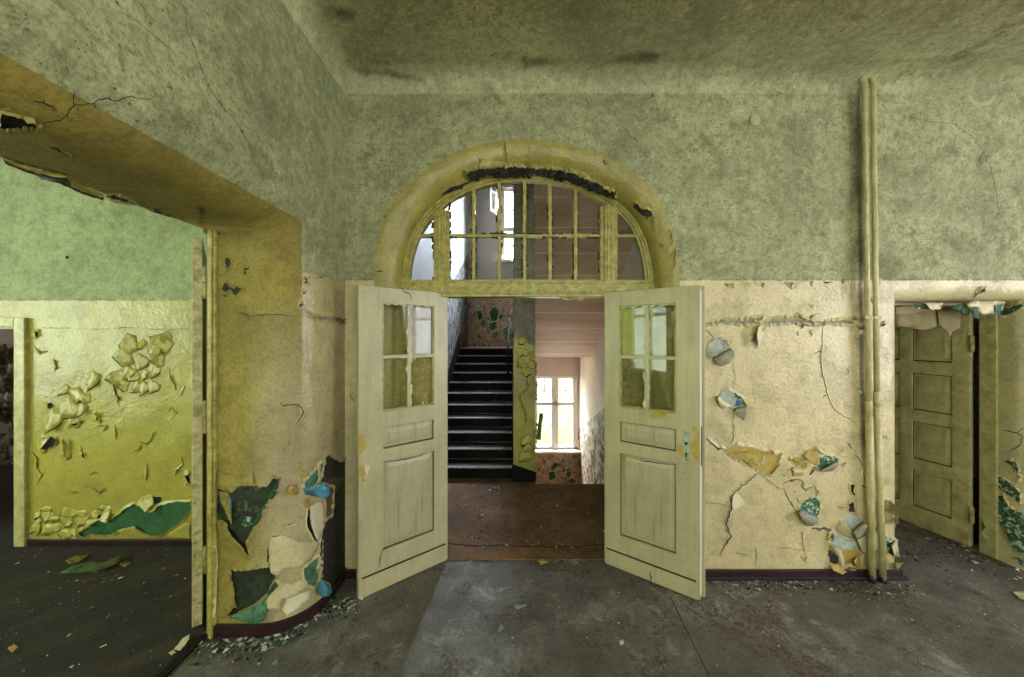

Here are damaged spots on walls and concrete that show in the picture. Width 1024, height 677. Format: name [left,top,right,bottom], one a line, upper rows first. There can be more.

crack [33,93,155,127]
crack [123,5,261,186]
spalling [440,158,676,268]
peeling [705,303,865,366]
peeling [43,330,175,435]
crack [706,360,735,450]
crack [814,326,889,491]
peeling [724,441,840,482]
peeling [29,494,192,539]
peeling [212,460,332,624]
crack [733,472,847,553]
spalling [797,482,903,575]